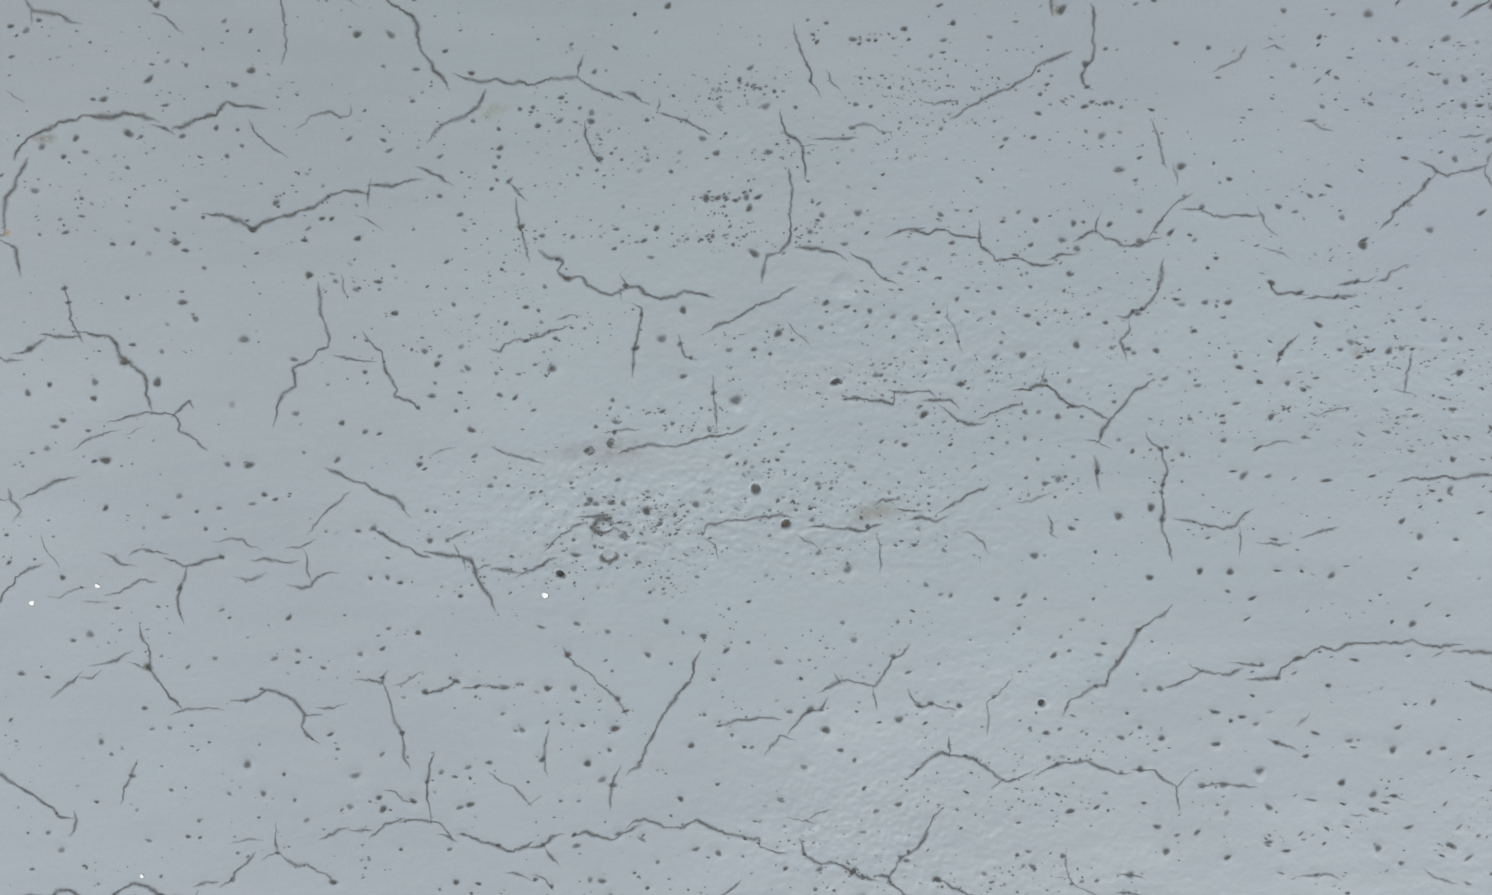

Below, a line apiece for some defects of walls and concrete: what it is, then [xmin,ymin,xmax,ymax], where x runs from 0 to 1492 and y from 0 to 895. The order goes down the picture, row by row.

crack [387,0,706,132]
crack [5,102,269,205]
crack [212,169,444,230]
crack [559,117,889,367]
crack [894,215,1165,351]
crack [21,292,199,446]
crack [276,289,415,416]
crack [849,382,1149,470]
crack [324,471,600,602]
crack [813,488,985,532]
crack [611,657,697,788]
crack [374,736,934,895]